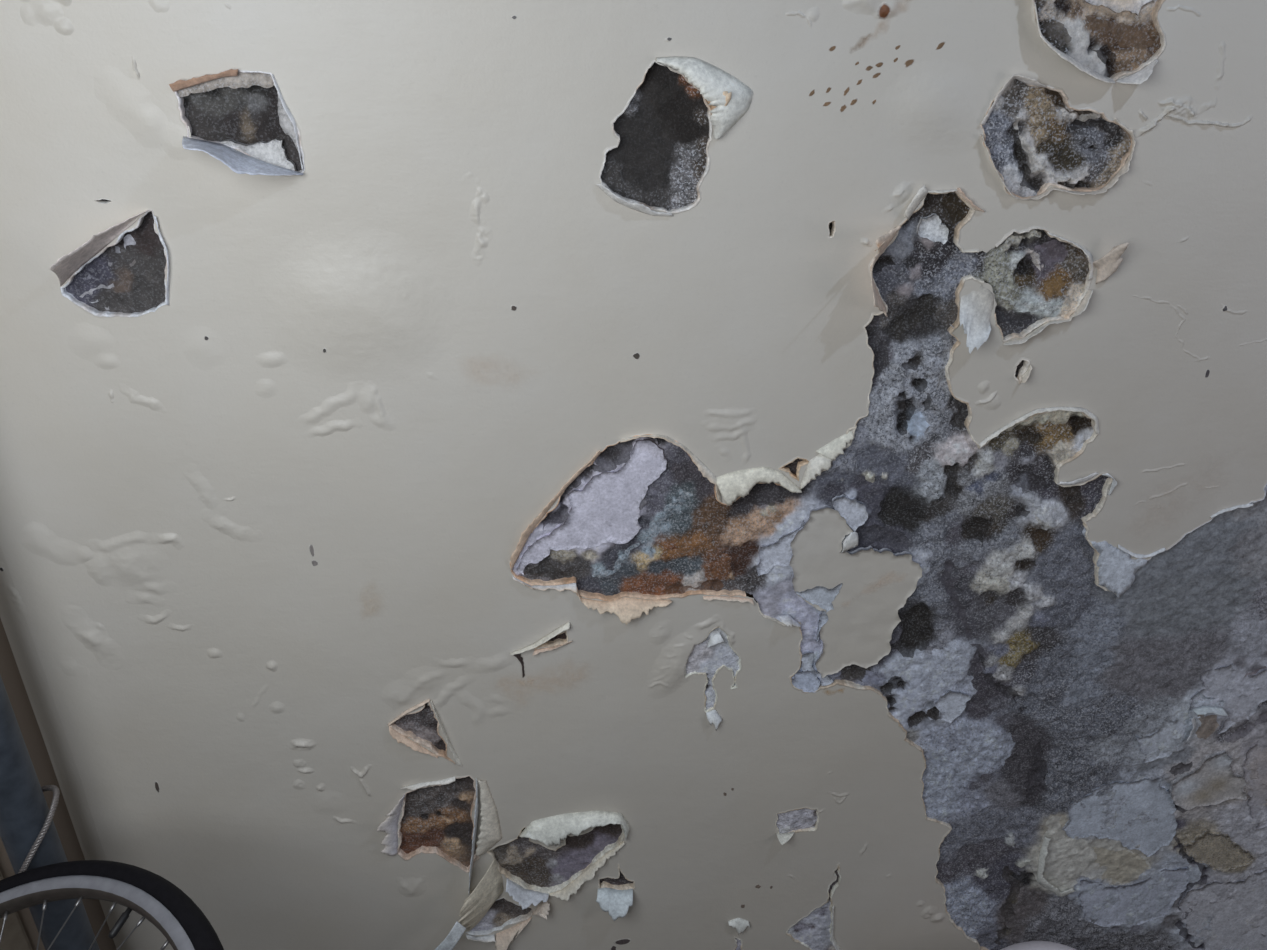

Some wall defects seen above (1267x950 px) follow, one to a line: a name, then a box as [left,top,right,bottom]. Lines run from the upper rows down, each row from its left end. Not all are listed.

spalling [1031,0,1167,84]
spalling [169,68,306,177]
spalling [596,56,753,216]
spalling [980,75,1136,201]
spalling [50,208,170,318]
spalling [827,220,836,239]
spalling [843,191,1130,450]
flaking render [509,410,1267,950]
spalling [377,699,636,950]